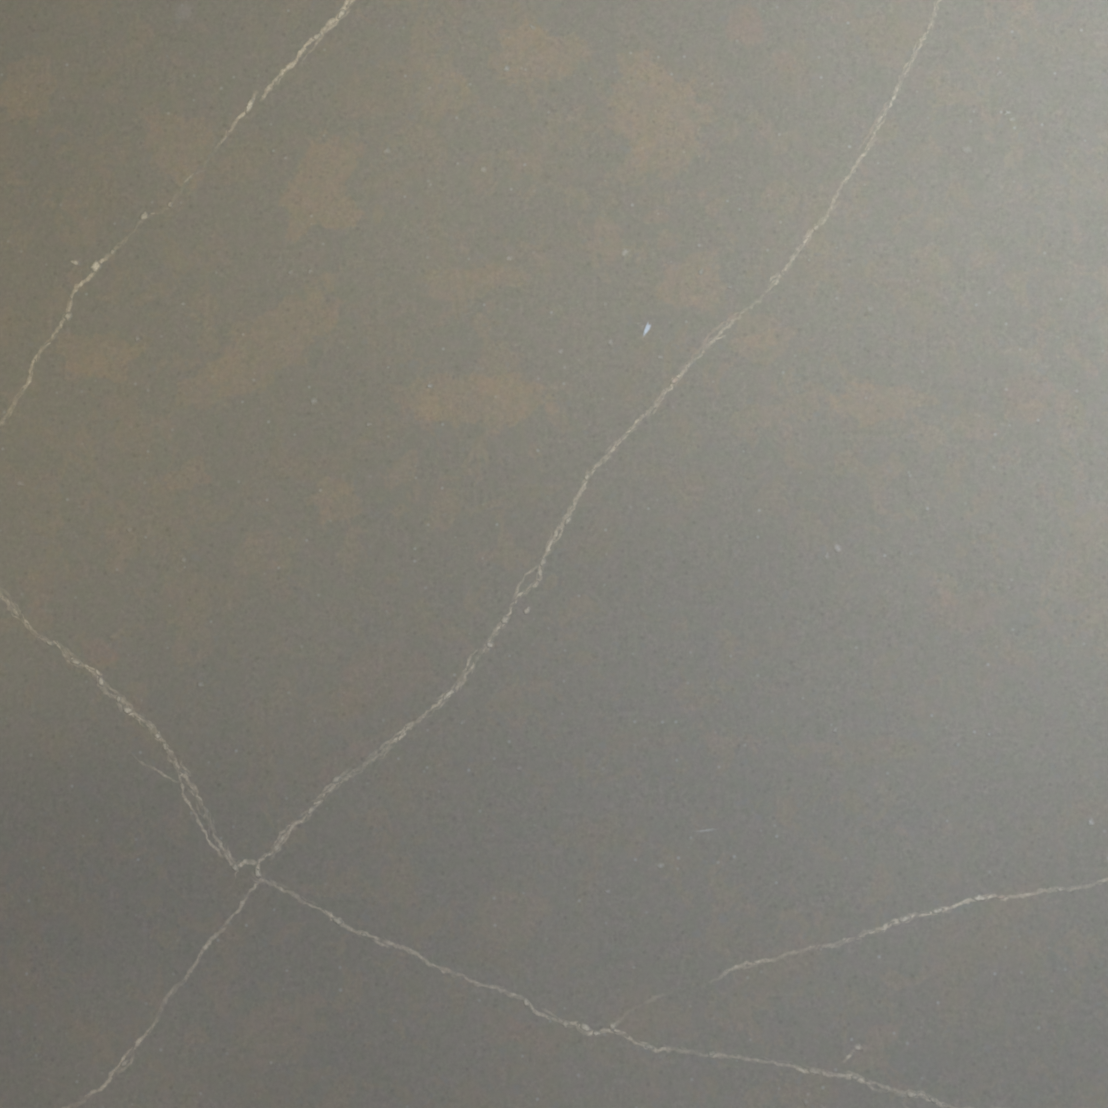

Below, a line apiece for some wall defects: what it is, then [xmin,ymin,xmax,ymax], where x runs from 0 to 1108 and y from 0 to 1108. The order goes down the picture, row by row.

crack [0,0,942,881]
crack [61,872,1108,1108]